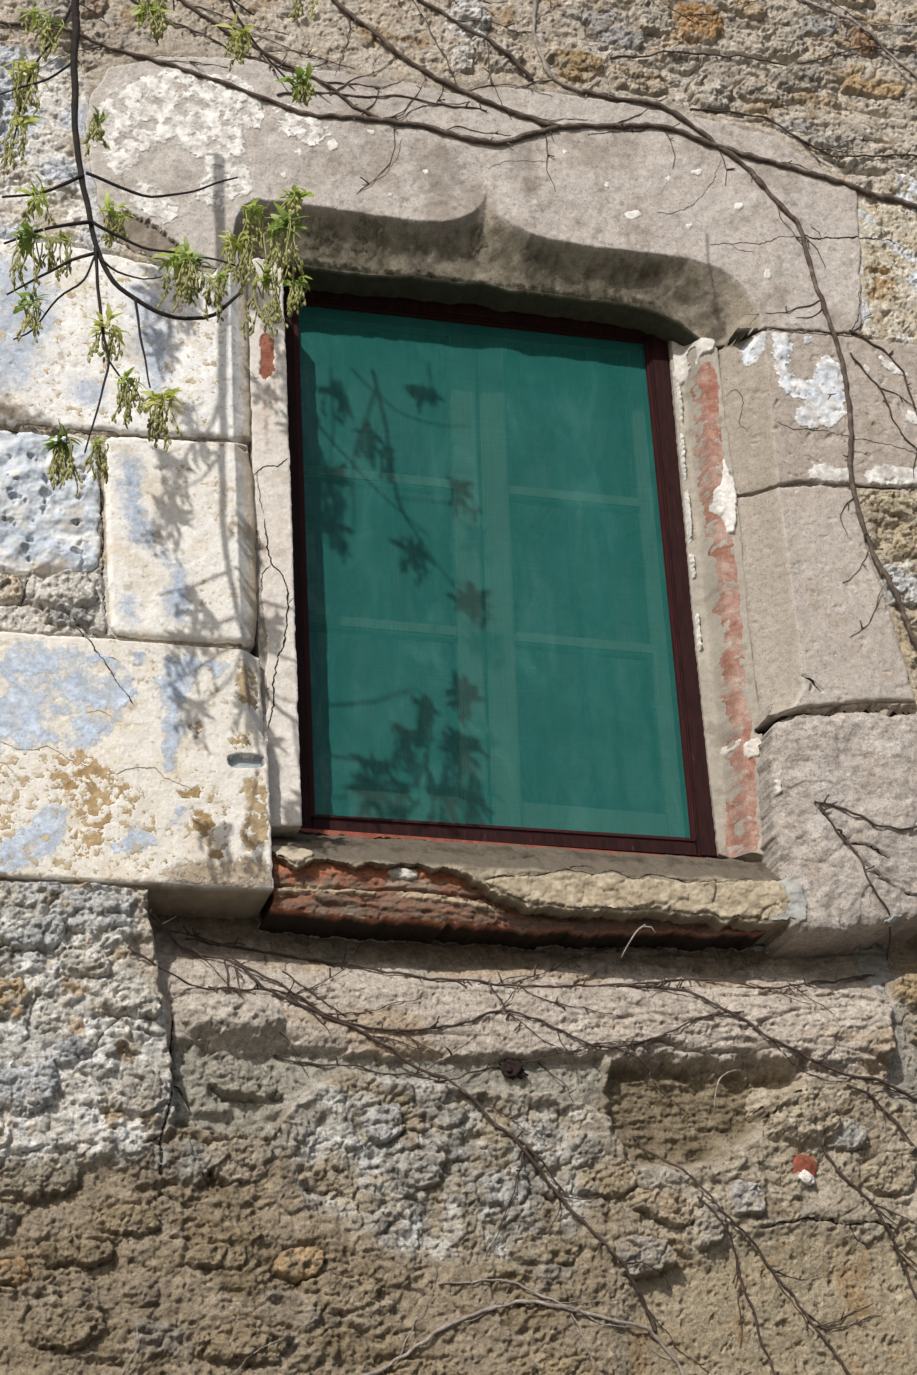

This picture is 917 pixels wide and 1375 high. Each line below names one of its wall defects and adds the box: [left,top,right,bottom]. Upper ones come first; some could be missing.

peeling [0,68,332,427]
peeling [738,332,847,429]
crack [0,426,292,729]
flaking render [672,338,777,858]
spalling [387,864,790,920]
crack [145,1017,192,1173]